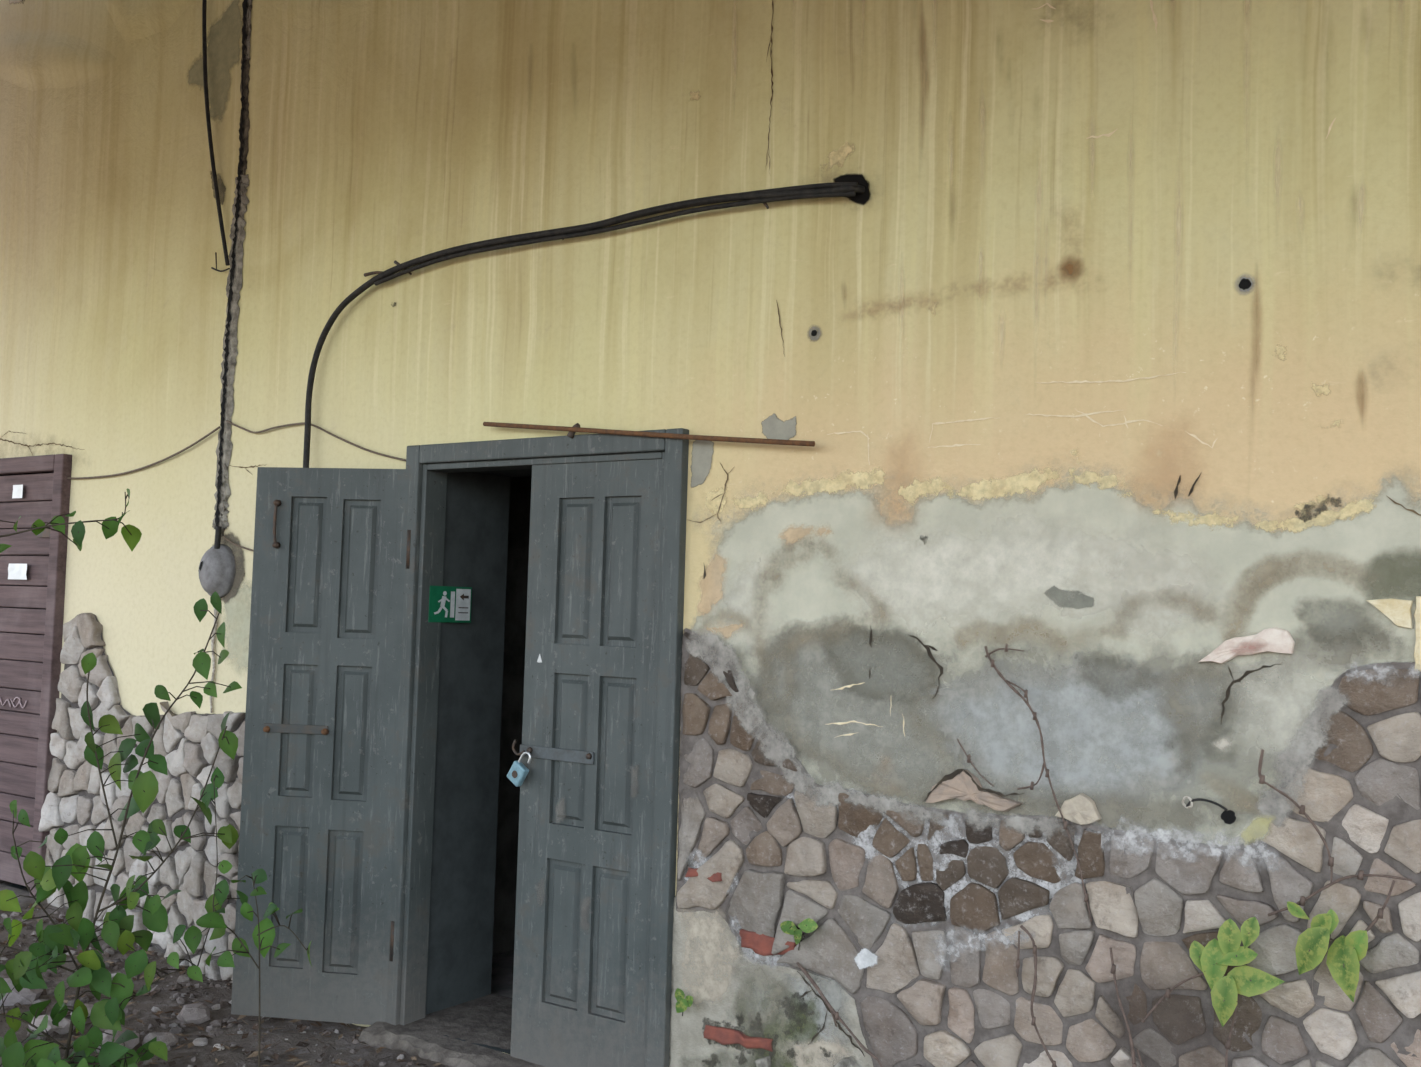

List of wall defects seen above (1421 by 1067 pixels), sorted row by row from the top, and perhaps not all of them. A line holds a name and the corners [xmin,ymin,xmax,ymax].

crack [766,0,774,169]
corrosion [1062,261,1078,277]
spalling [761,414,797,440]
damp [1295,497,1341,522]
flaking render [691,440,1421,846]